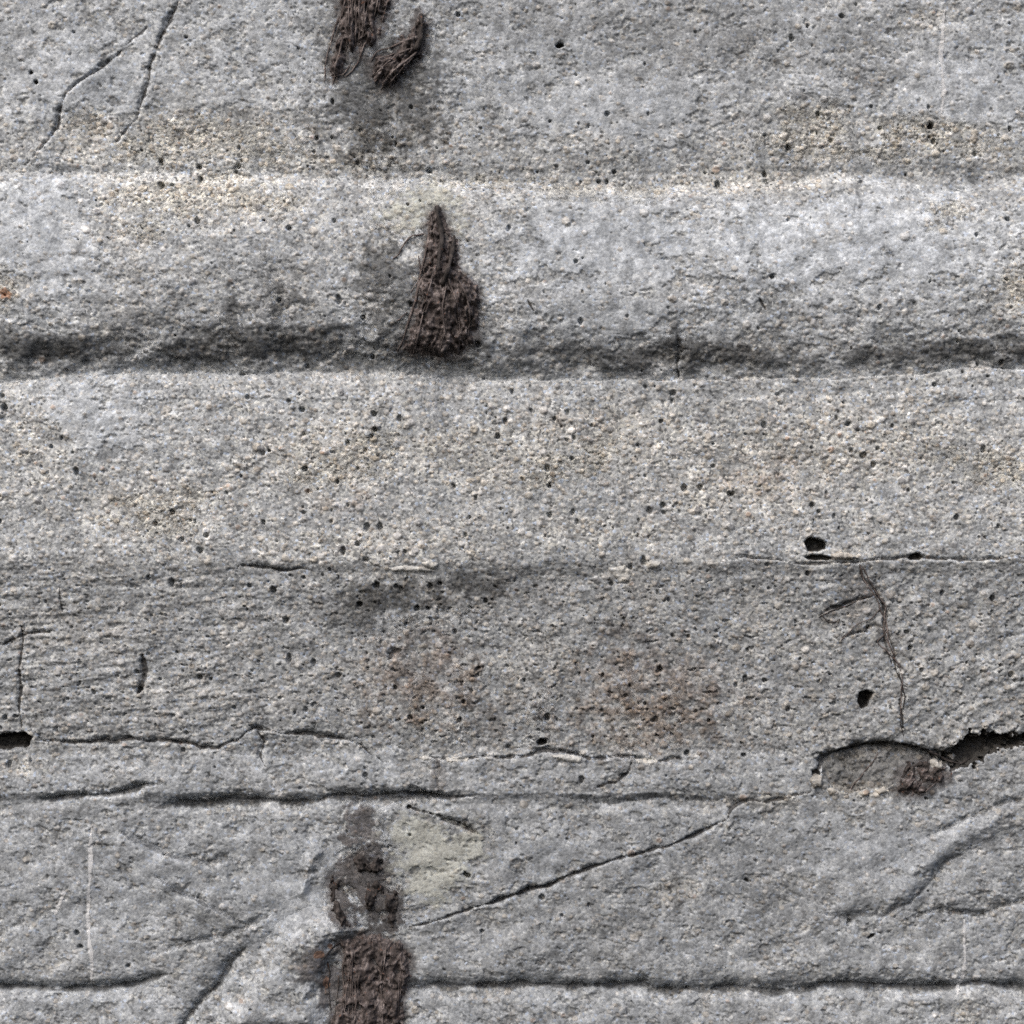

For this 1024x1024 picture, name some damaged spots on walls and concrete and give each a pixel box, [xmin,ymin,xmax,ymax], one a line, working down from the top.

crack [25,2,178,165]
leakage [327,25,449,165]
leakage [353,181,466,360]
crack [3,587,383,766]
crack [409,555,1024,927]
spalling [822,728,1024,793]